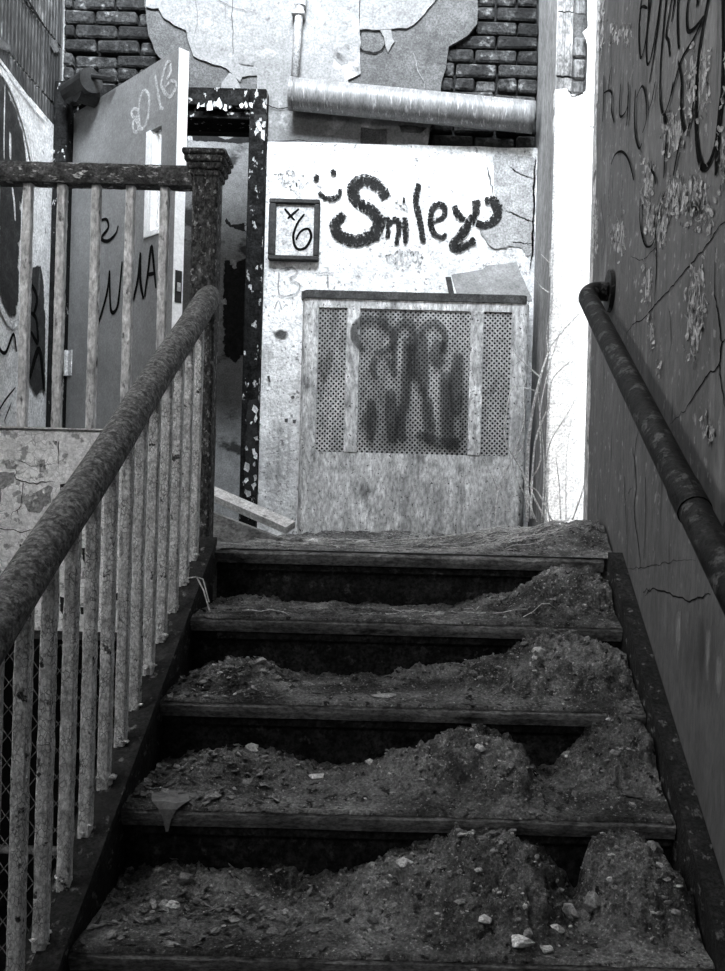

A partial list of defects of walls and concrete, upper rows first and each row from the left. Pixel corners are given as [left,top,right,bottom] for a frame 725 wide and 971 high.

flaking render [64,0,266,144]
flaking render [348,0,539,256]
peeling [592,197,627,264]
crack [601,199,725,420]
peeling [639,41,725,379]
peeling [0,457,18,502]
peeling [24,459,65,513]
crack [624,435,709,603]